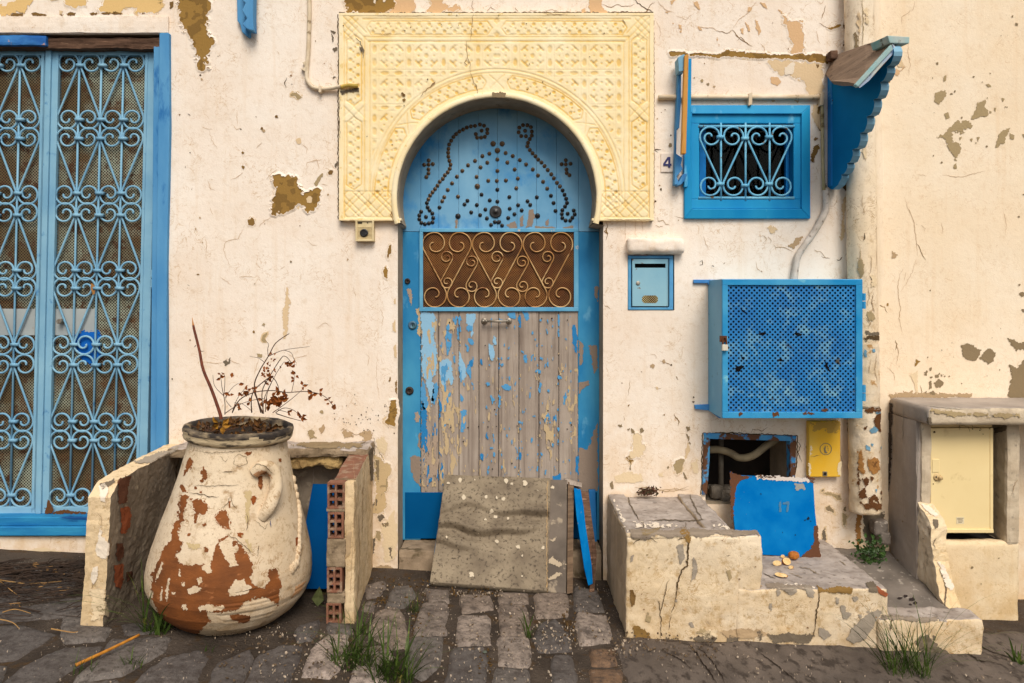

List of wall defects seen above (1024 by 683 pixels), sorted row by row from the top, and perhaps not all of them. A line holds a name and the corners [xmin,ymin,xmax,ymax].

peeling [0,0,220,80]
peeling [330,0,463,52]
peeling [667,2,831,162]
peeling [932,73,1024,169]
spalling [245,161,338,228]
peeling [961,328,1024,398]
peeling [393,288,760,543]
spalling [372,453,396,568]
crack [628,428,802,630]